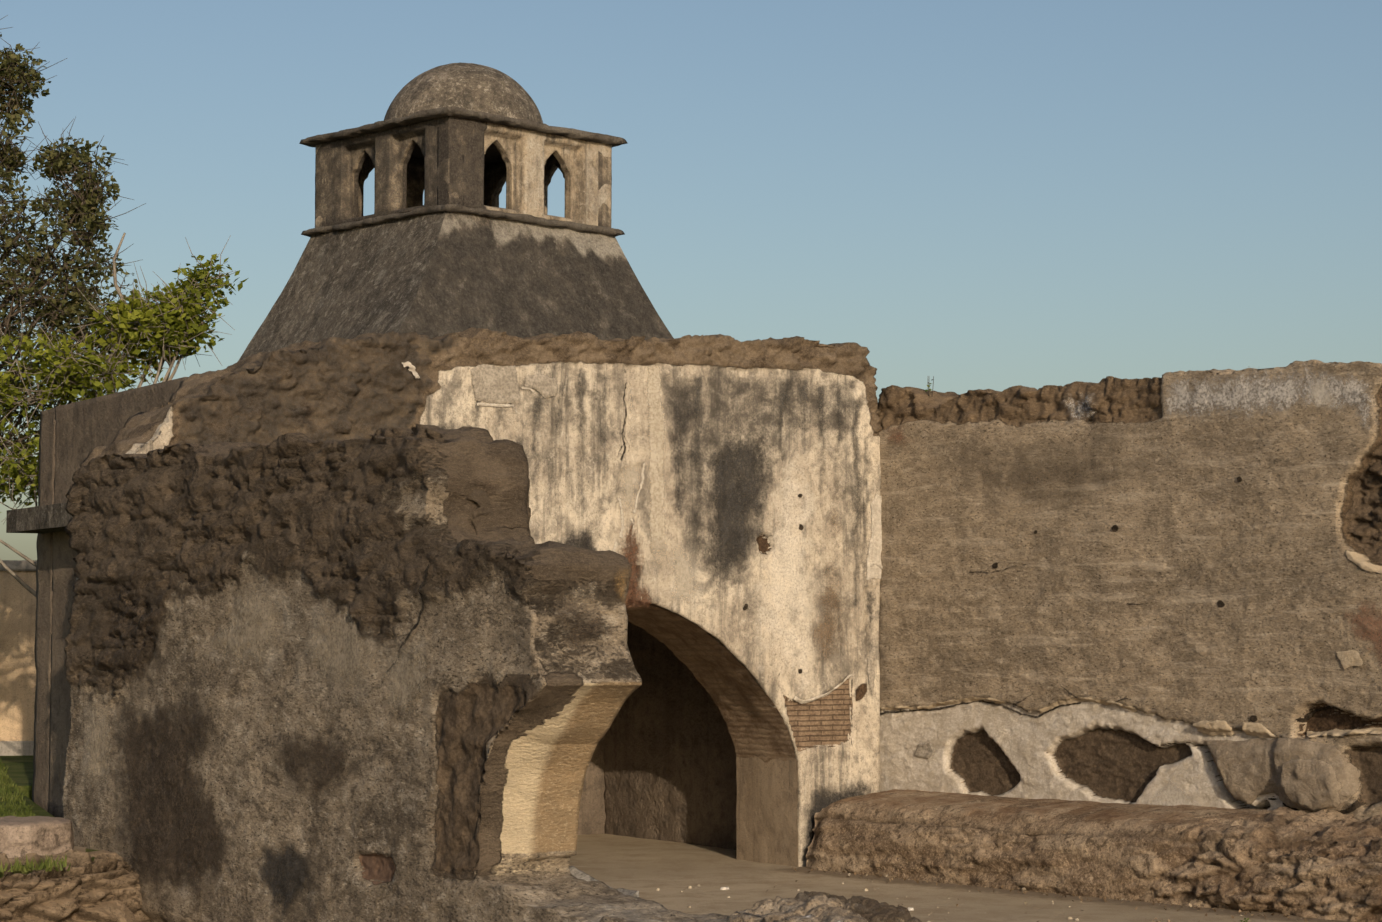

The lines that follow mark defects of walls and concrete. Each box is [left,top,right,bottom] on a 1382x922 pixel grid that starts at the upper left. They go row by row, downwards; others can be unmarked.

damp [564,531,597,551]
damp [577,370,586,439]
rust [622,525,651,606]
damp [648,367,763,597]
damp [777,381,869,526]
peeling [866,494,883,622]
peeling [1166,368,1382,424]
spalling [1343,443,1382,573]
spalling [783,657,1283,810]